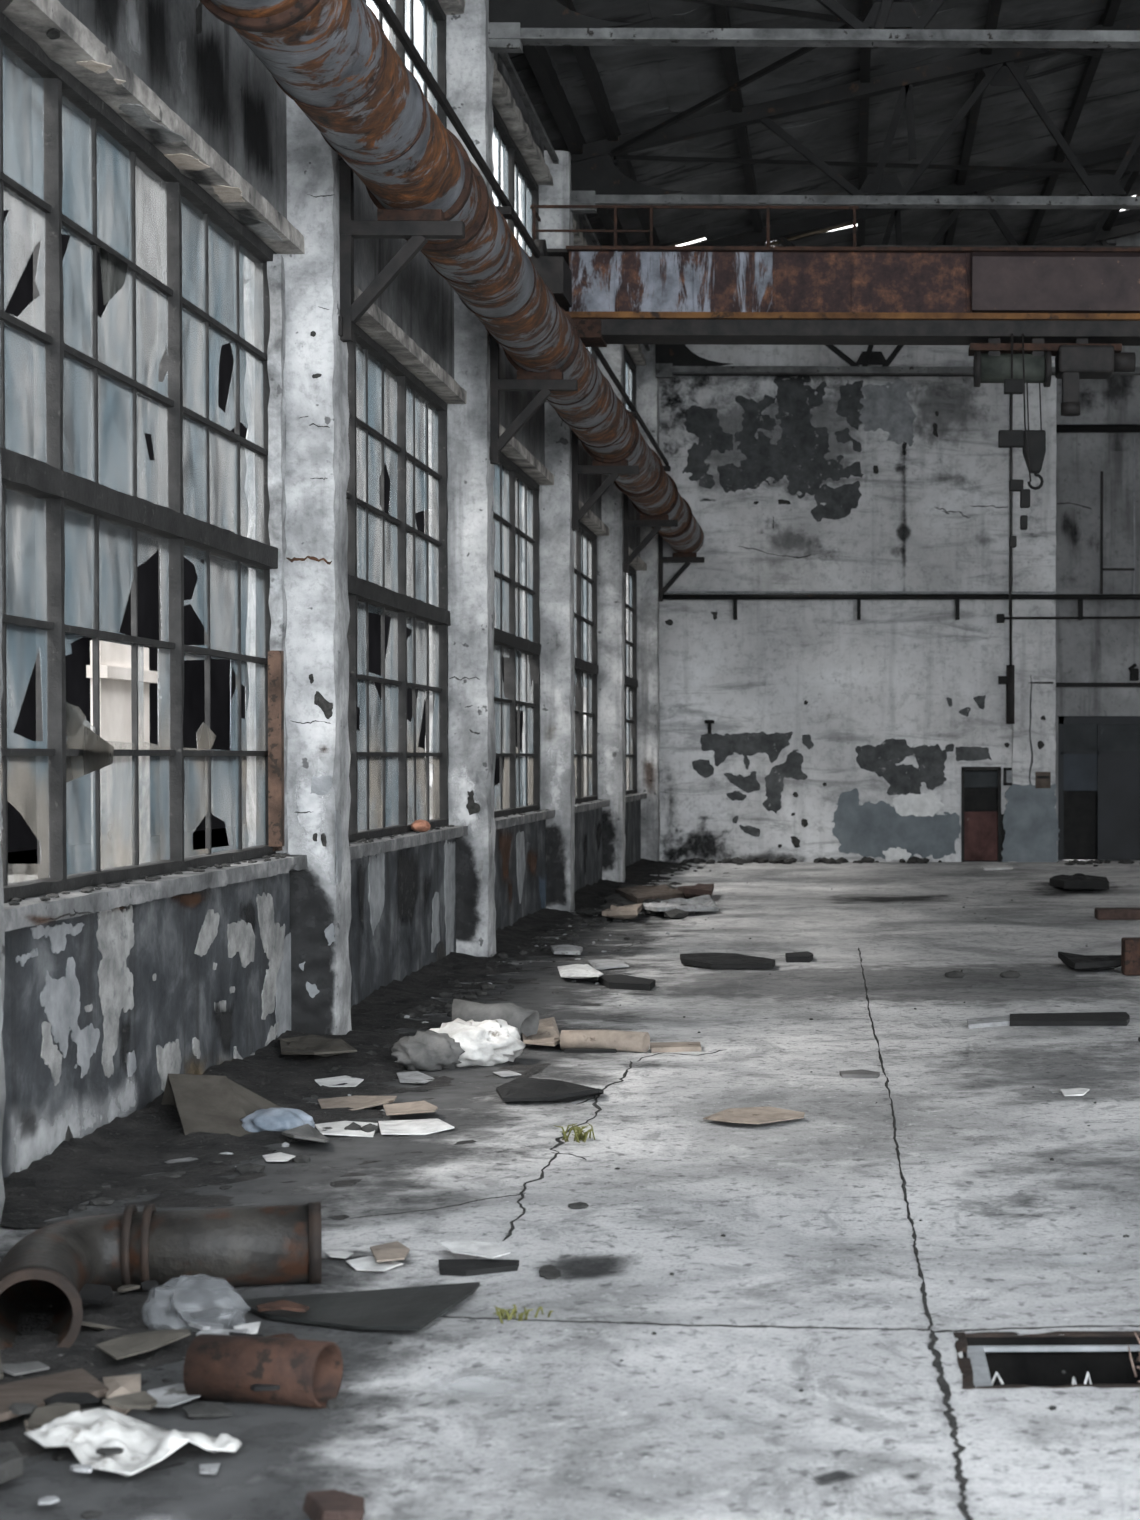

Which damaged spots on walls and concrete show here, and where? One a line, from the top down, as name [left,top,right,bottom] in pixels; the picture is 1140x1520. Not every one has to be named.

peeling [682,376,916,522]
peeling [946,695,986,717]
peeling [692,731,1010,862]
peeling [15,905,137,1086]
peeling [195,892,320,1060]
peeling [324,923,336,946]
peeling [368,853,385,935]
peeling [431,840,455,956]
peeling [516,831,526,904]
peeling [156,1037,201,1091]
crack [350,1050,721,1241]